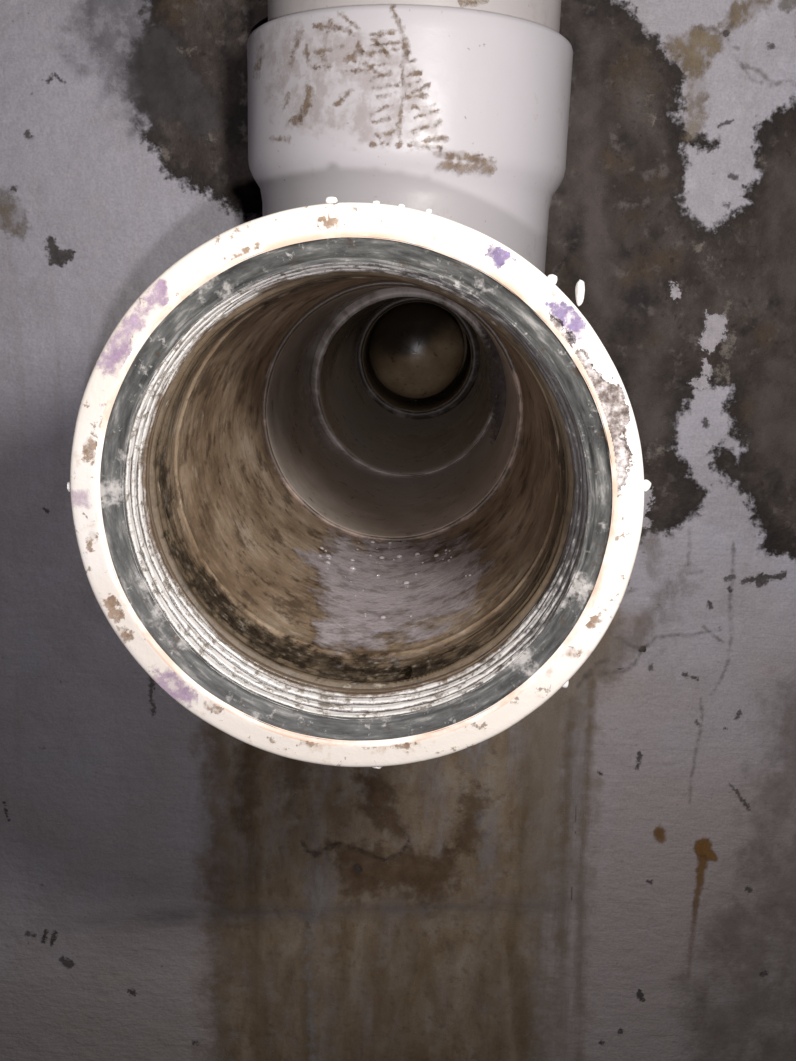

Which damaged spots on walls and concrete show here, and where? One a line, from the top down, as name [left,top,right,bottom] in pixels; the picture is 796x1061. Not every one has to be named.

flaking render [545,0,796,560]
flaking render [479,326,507,443]
peeling [725,571,787,592]
damp [202,612,620,1061]
corrosion [694,839,717,911]